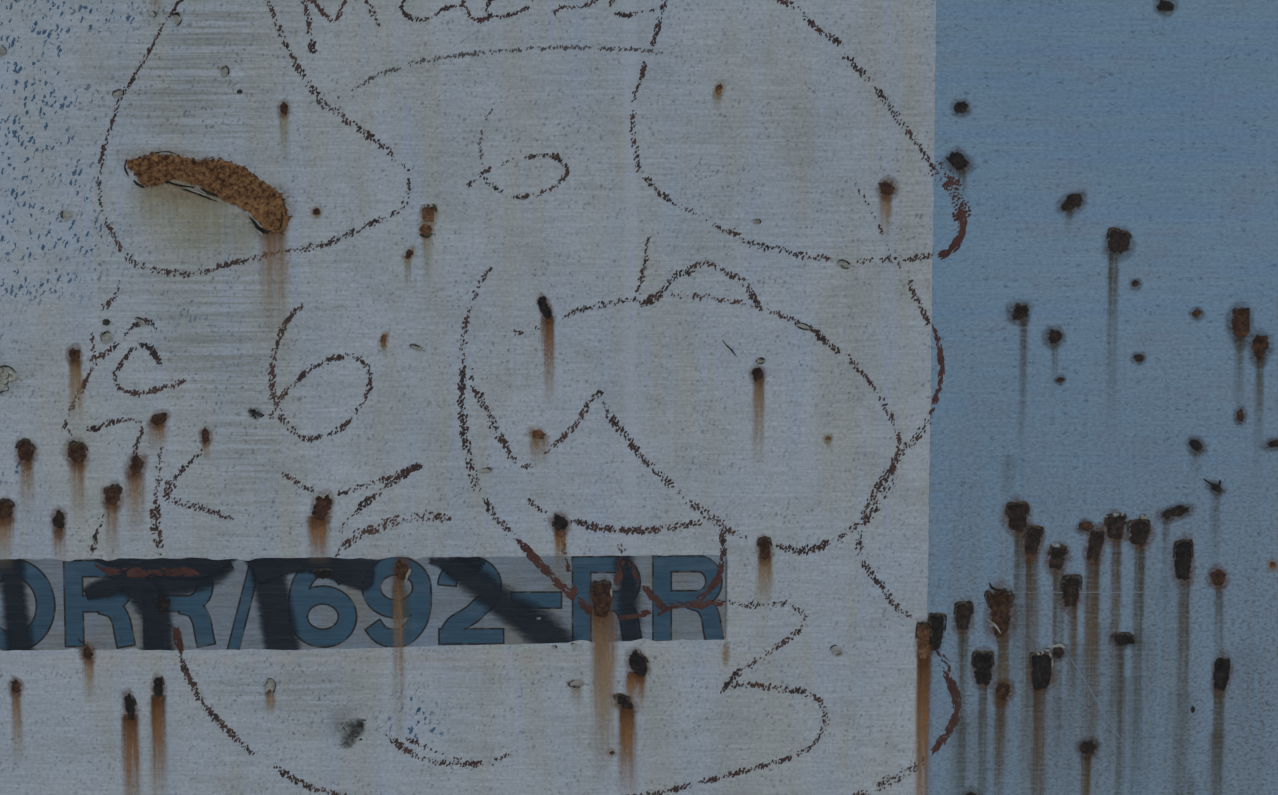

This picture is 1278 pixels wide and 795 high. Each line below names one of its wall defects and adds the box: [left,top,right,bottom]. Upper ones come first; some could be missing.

corrosion [124,151,293,275]
corrosion [538,296,553,361]
corrosion [1230,308,1269,392]
corrosion [15,438,36,480]
corrosion [67,440,88,484]
corrosion [103,455,144,527]
corrosion [1173,539,1194,651]
corrosion [124,693,139,784]
corrosion [152,676,165,759]
corrosion [591,579,649,768]
corrosion [915,501,1190,795]
corrosion [1213,657,1231,756]